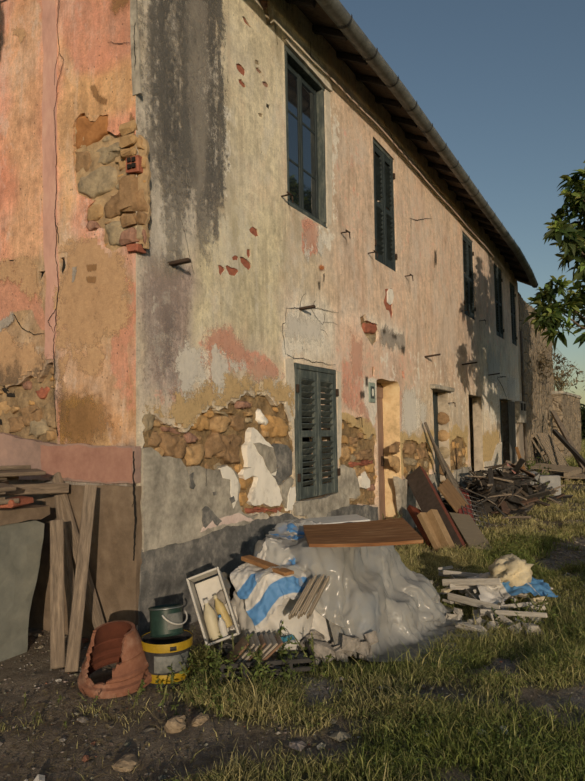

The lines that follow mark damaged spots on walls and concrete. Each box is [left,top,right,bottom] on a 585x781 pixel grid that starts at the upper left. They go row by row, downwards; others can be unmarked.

peeling [91,84,107,104]
leakage [130,0,228,275]
crack [13,0,64,436]
spalling [0,115,151,444]
spalling [218,249,250,276]
crack [282,295,337,365]
peeling [342,288,405,423]
spalling [142,324,296,532]
spalling [339,421,377,505]
spalling [388,376,430,479]
spalling [450,436,466,470]